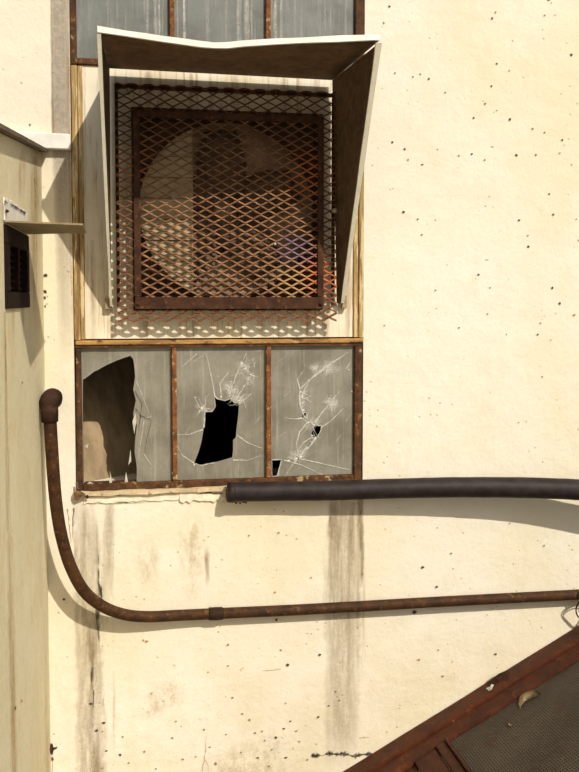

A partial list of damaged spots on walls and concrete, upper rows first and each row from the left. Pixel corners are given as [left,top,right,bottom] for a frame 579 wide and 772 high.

peeling [74,482,247,505]